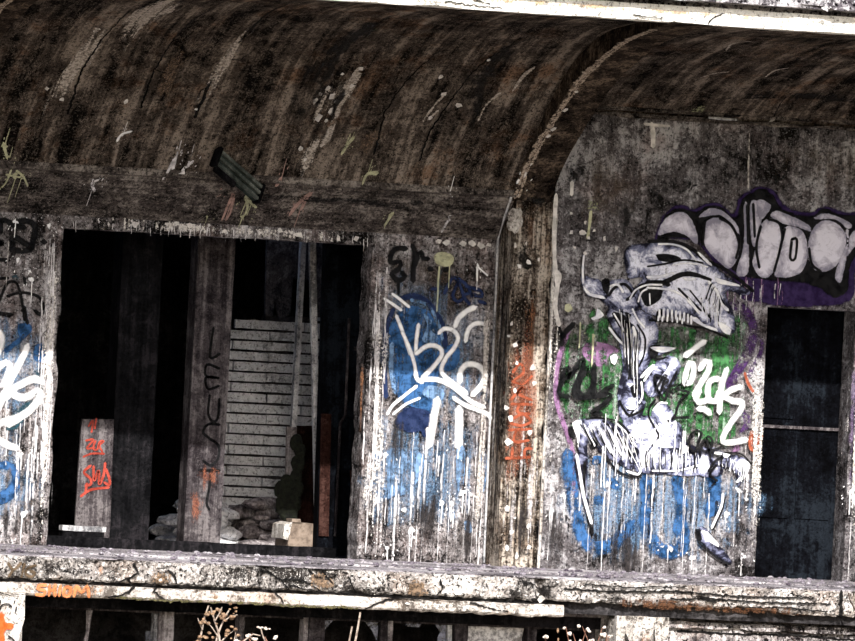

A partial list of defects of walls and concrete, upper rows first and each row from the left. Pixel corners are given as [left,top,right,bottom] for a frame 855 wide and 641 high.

leakage [644,122,670,148]
leakage [489,264,509,532]
crack [108,563,165,600]
crack [259,568,508,612]